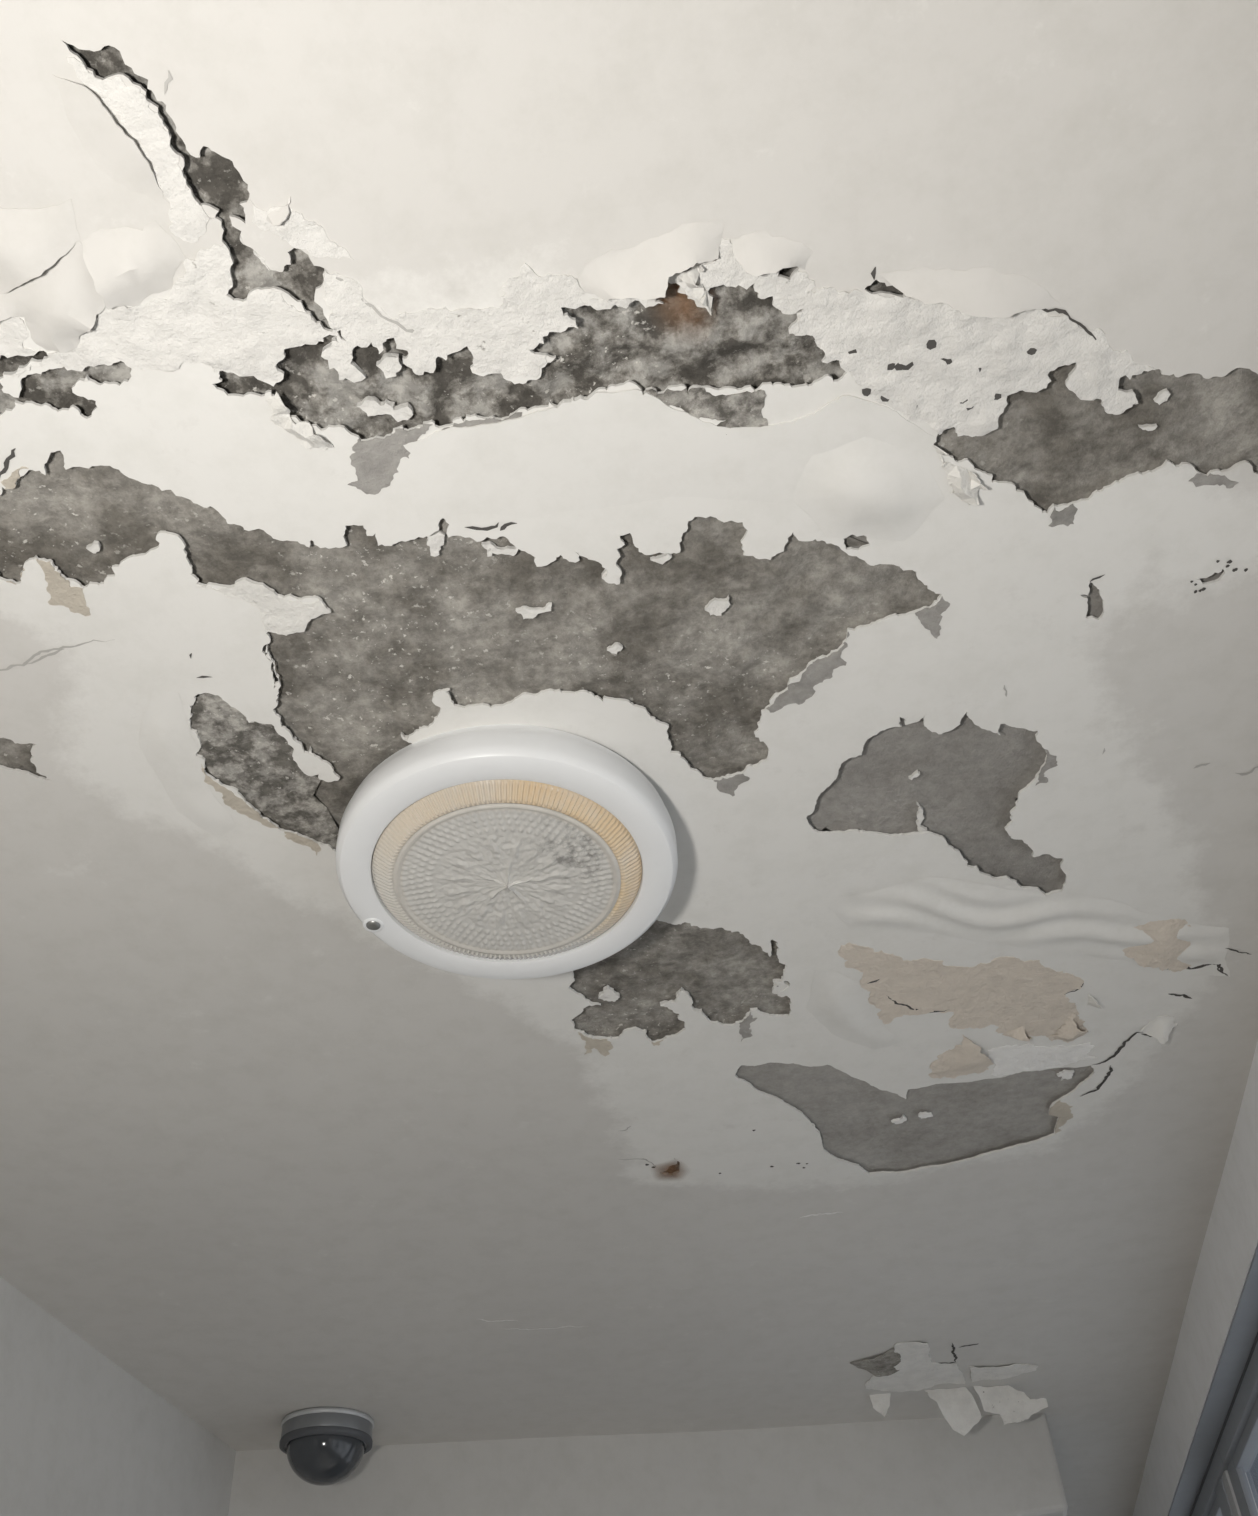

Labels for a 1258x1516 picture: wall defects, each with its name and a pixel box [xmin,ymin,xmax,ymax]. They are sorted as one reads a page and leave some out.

spalling [0,44,1258,855]
crack [0,639,115,671]
spalling [806,714,1066,893]
spalling [569,920,791,1056]
spalling [736,942,1102,1172]
peeling [850,1342,1048,1436]